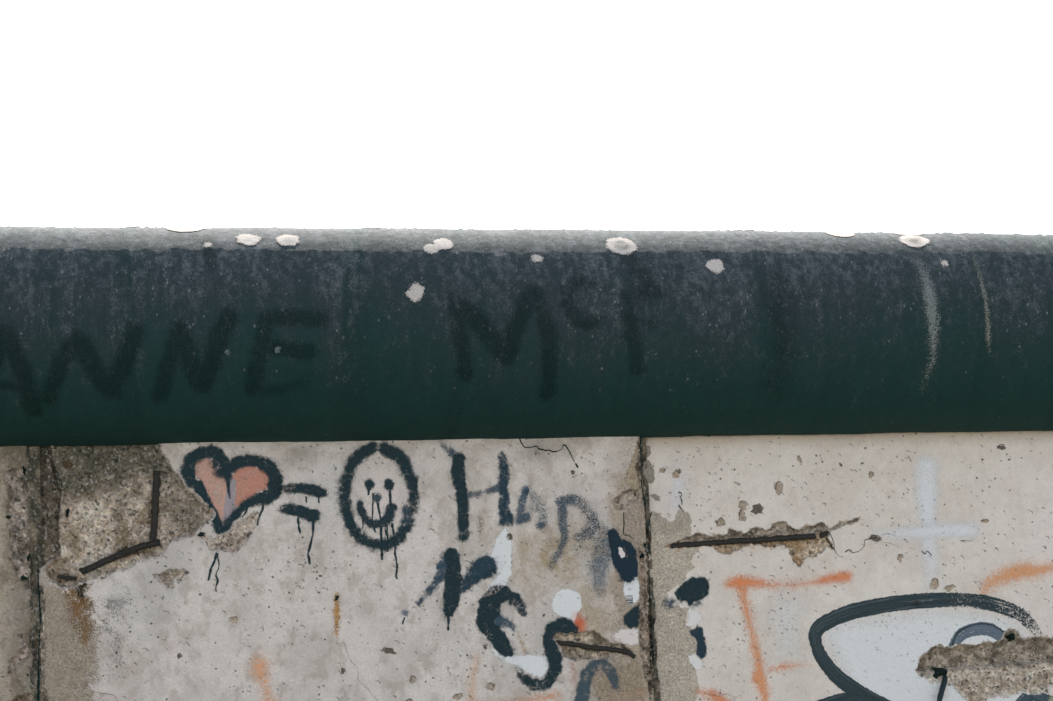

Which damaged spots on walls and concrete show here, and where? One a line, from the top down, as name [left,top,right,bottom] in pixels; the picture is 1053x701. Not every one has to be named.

water stain [909,249,943,387]
water stain [969,250,993,356]
spalling [3,444,259,701]
peeling [553,438,860,701]
spalling [915,628,1053,701]